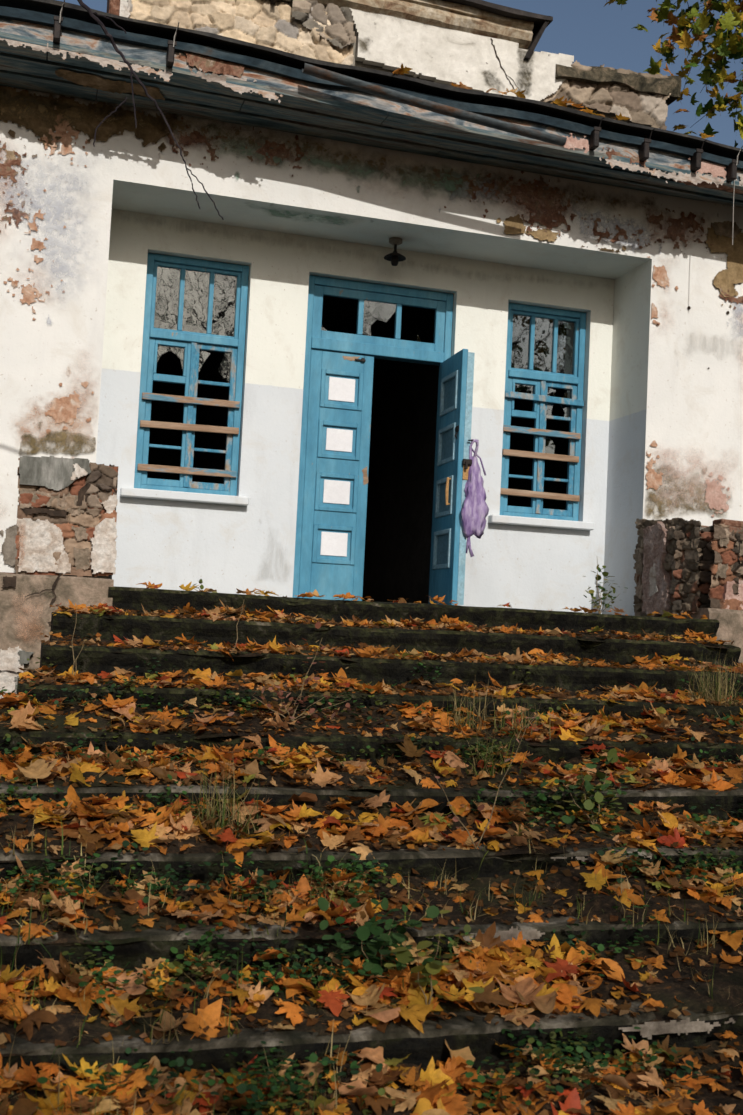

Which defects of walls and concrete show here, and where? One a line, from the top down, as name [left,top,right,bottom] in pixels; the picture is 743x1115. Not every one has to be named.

spalling [0,85,228,320]